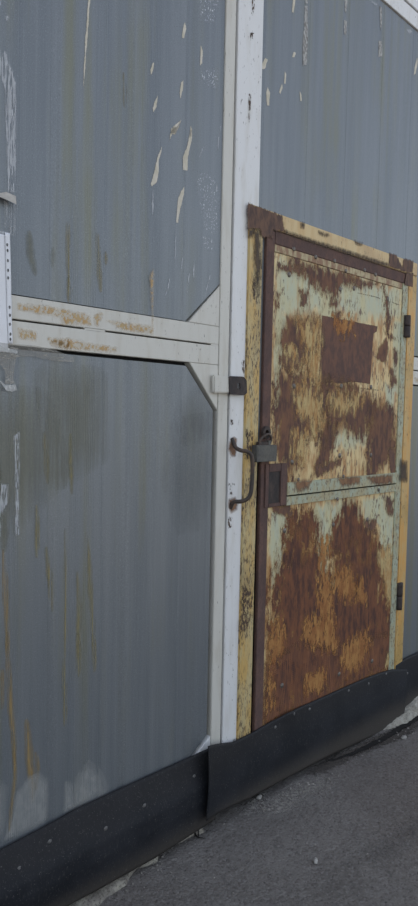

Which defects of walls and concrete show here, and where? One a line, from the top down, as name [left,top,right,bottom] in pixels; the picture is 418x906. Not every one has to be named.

peeling [151,147,162,186]
peeling [170,120,192,171]
rust [247,202,414,300]
peeling [284,311,365,467]
rust [271,257,408,491]
leakage [0,434,20,535]
rust [229,429,253,458]
rust [386,495,394,517]
rust [238,586,253,631]
rust [262,498,390,724]
peeling [300,533,373,681]
peeling [377,545,393,608]